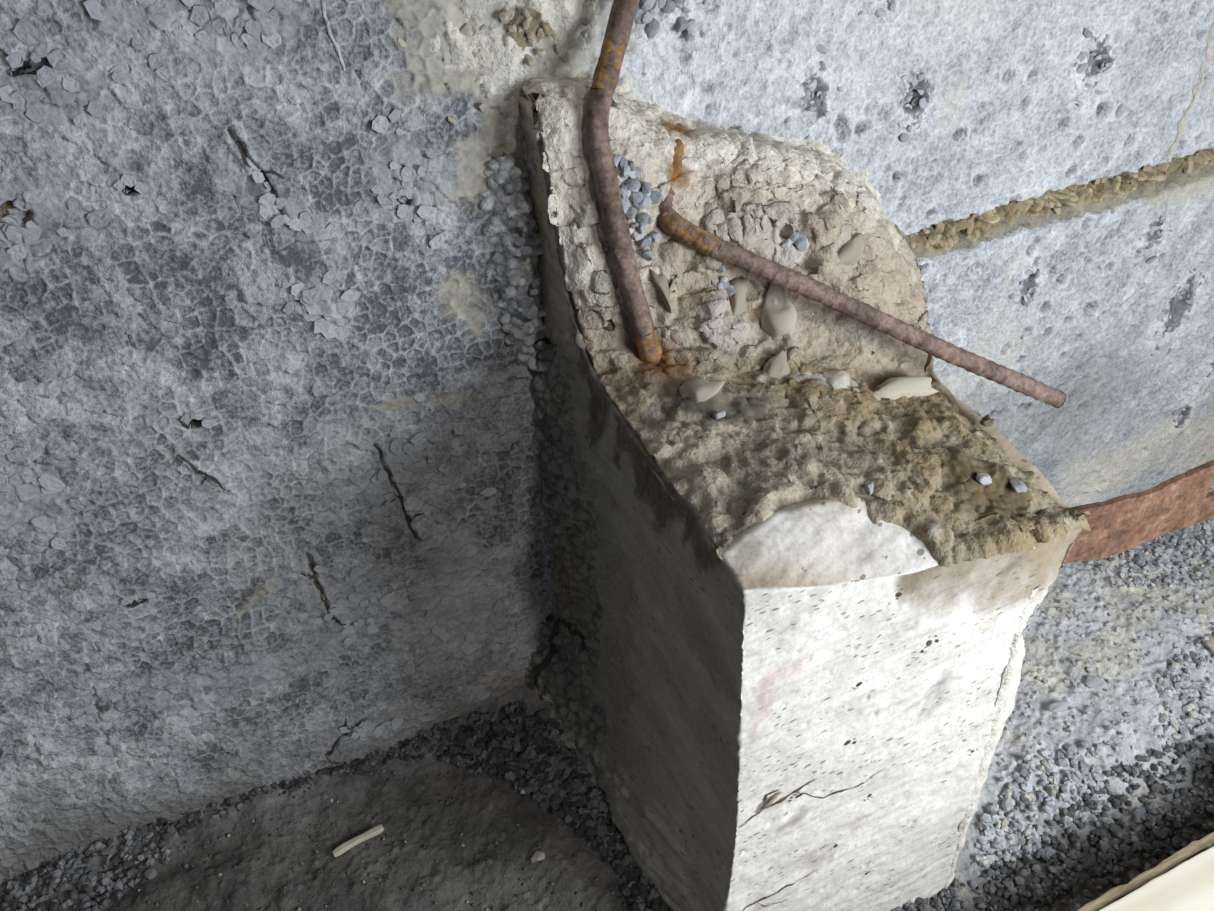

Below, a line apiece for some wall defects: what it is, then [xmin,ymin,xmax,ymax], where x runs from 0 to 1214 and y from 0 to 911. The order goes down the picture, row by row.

spalling [1074,28,1116,107]
crack [227,129,285,215]
spalling [499,0,1091,567]
rust [638,348,685,372]
crack [177,454,230,492]
crack [373,444,424,540]
peeling [384,430,466,511]
crack [302,552,357,626]
crack [528,615,588,690]
crack [739,772,879,828]